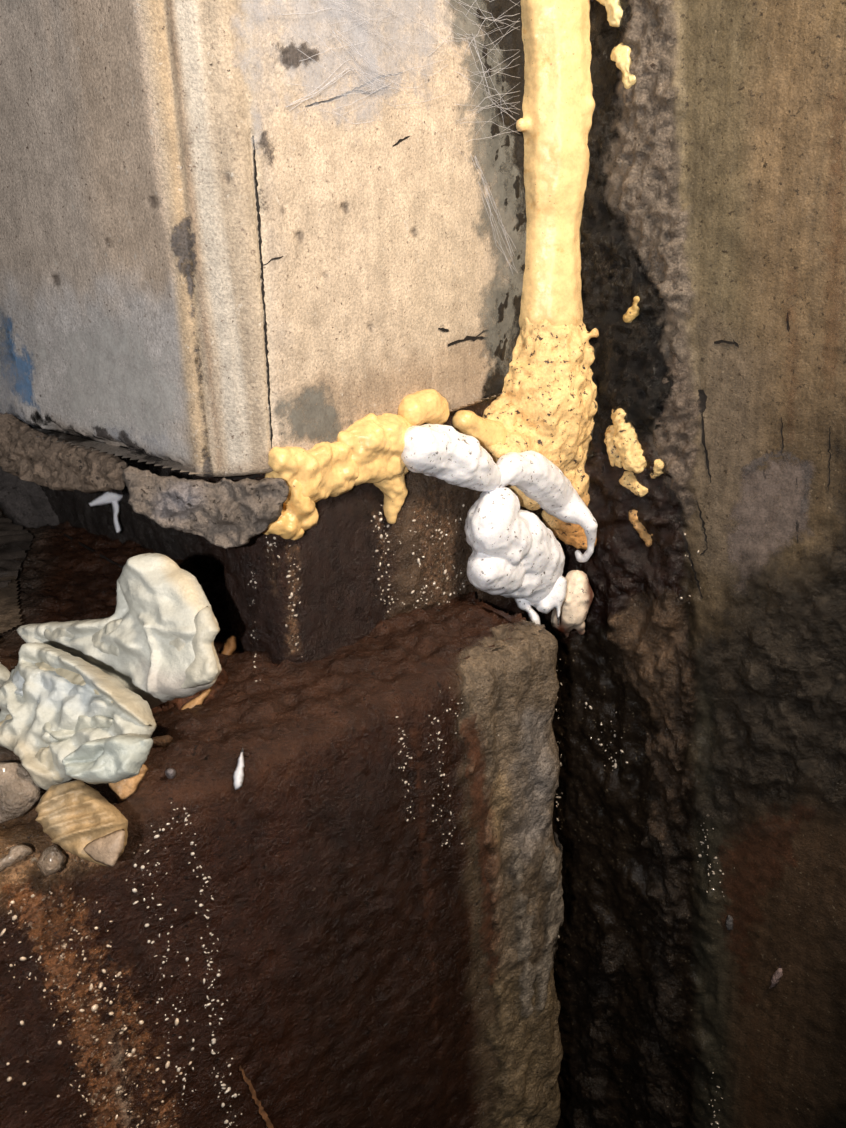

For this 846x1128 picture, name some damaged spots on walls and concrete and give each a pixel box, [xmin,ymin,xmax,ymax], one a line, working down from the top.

crack [252,136,283,448]
leakage [548,0,691,645]
leakage [0,842,98,894]